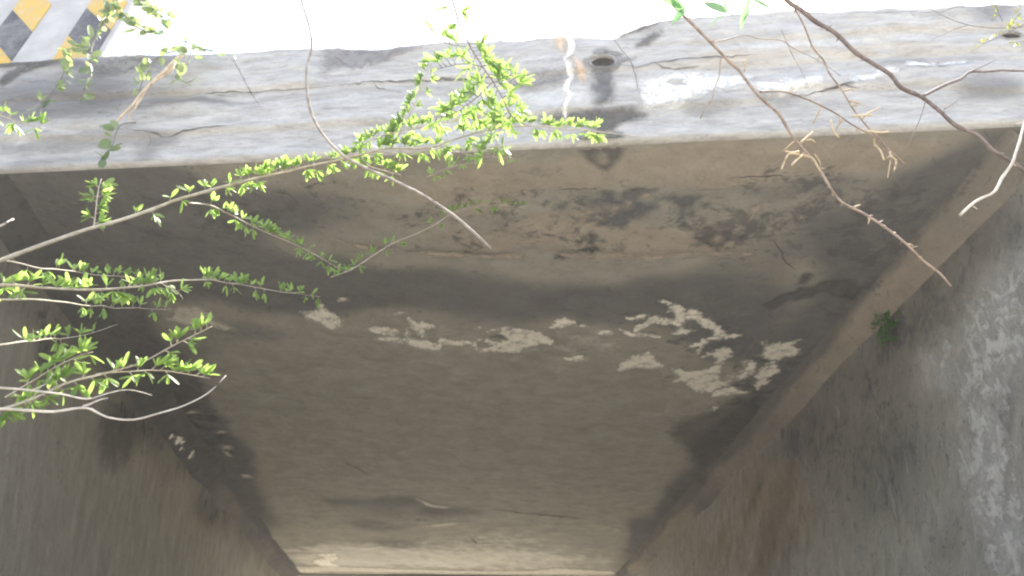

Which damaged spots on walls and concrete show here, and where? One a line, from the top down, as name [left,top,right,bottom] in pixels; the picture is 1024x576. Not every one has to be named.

crack [157,59,513,110]
crack [124,123,241,146]
damp [535,68,822,169]
damp [578,189,655,254]
peeling [305,298,346,330]
peeling [367,312,585,353]
peeling [598,300,800,411]